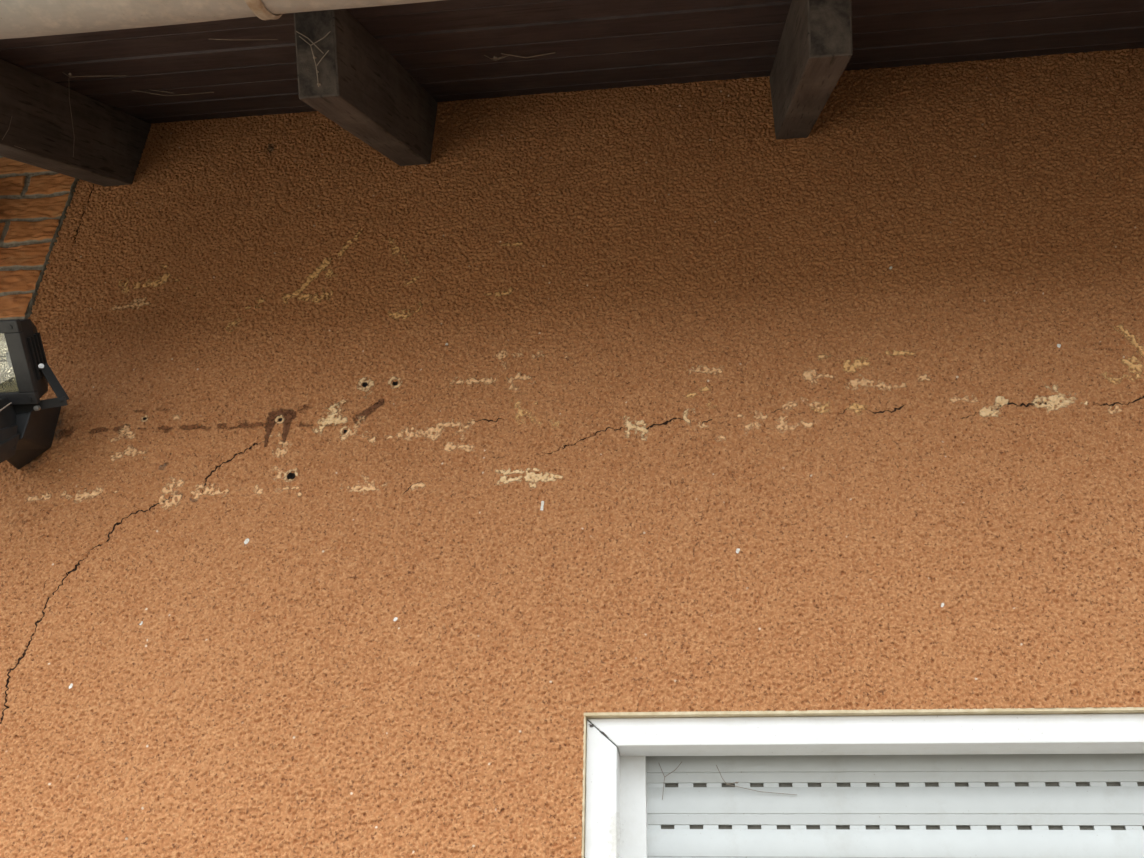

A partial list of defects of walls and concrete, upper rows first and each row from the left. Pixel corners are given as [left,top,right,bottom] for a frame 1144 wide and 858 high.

crack [816,404,906,414]
spalling [950,395,1009,417]
crack [961,402,1047,419]
spalling [1033,385,1087,411]
crack [1094,396,1144,406]
peeling [313,399,475,452]
crack [536,418,712,456]
crack [201,441,264,493]
peeling [495,468,563,488]
crack [0,497,172,724]